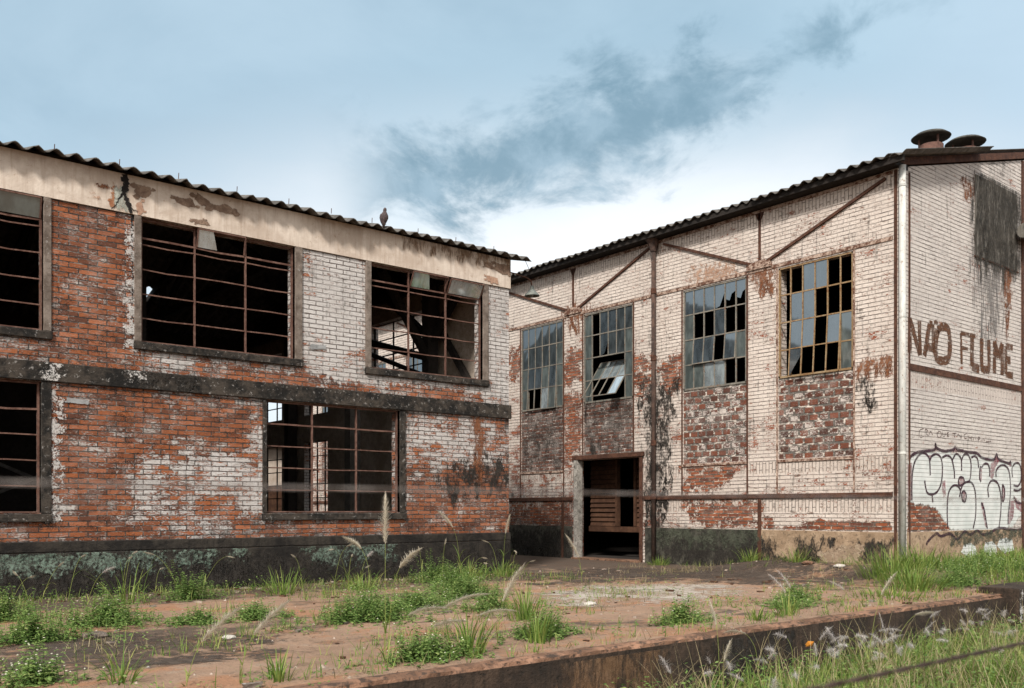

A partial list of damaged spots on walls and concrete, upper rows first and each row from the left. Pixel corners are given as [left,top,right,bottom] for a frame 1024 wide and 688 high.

peeling [0,185,141,370]
crack [111,174,136,337]
flaking render [170,192,240,226]
water stain [969,170,1022,354]
peeling [0,382,262,582]
water stain [0,526,894,607]
water stain [433,451,509,509]
peeling [564,345,582,460]
water stain [637,372,681,527]
peeling [678,463,892,563]
mould [856,376,878,413]
peeling [907,502,950,532]